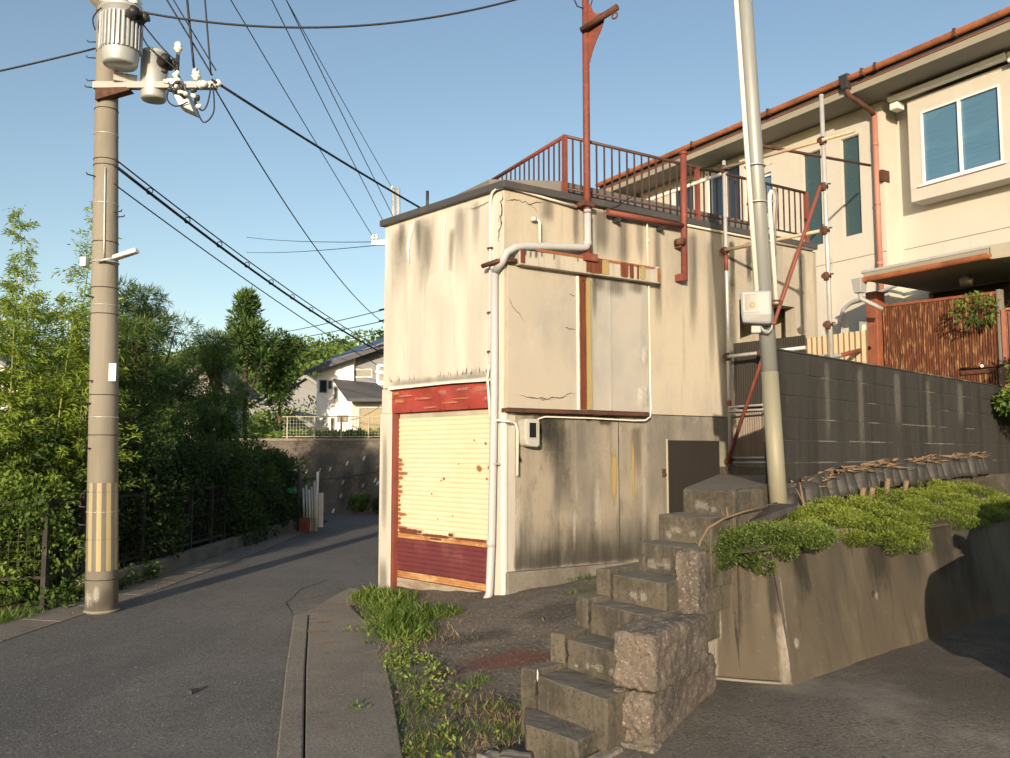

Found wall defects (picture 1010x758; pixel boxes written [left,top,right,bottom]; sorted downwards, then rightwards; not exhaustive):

corrosion [521,249,661,410]
leakage [534,416,554,438]
corrosion [398,458,407,529]